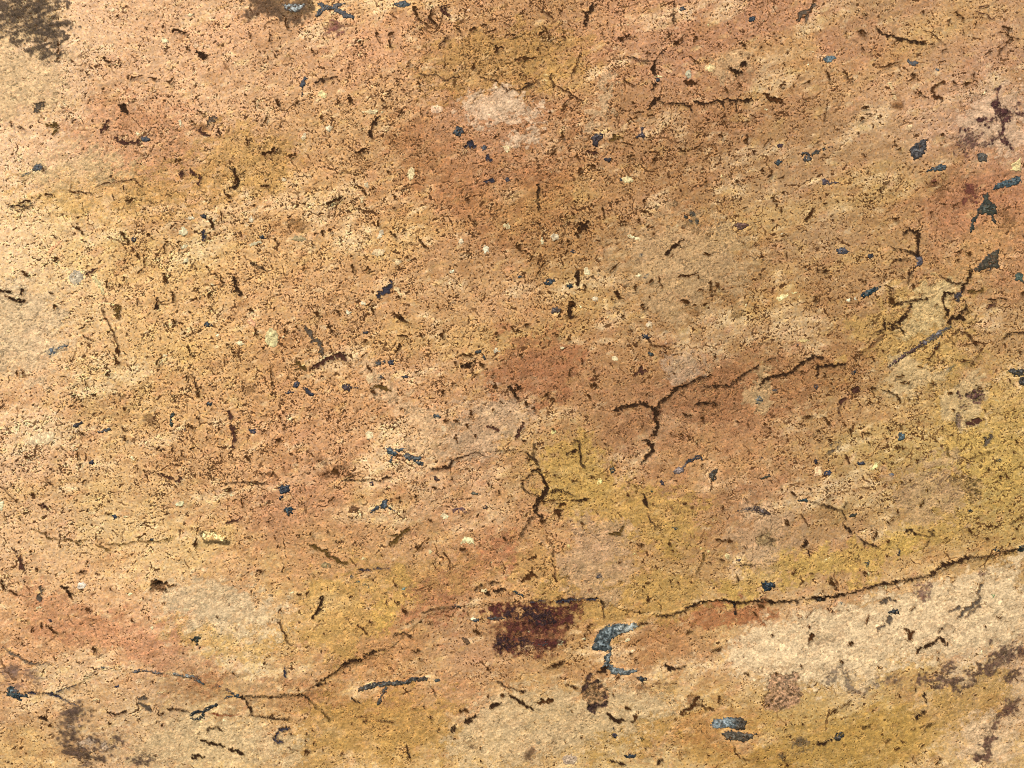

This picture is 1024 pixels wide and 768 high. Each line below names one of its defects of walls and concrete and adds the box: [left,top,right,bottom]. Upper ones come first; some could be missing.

crack [611,227,1024,465]
crack [429,440,590,541]
crack [638,516,1024,627]